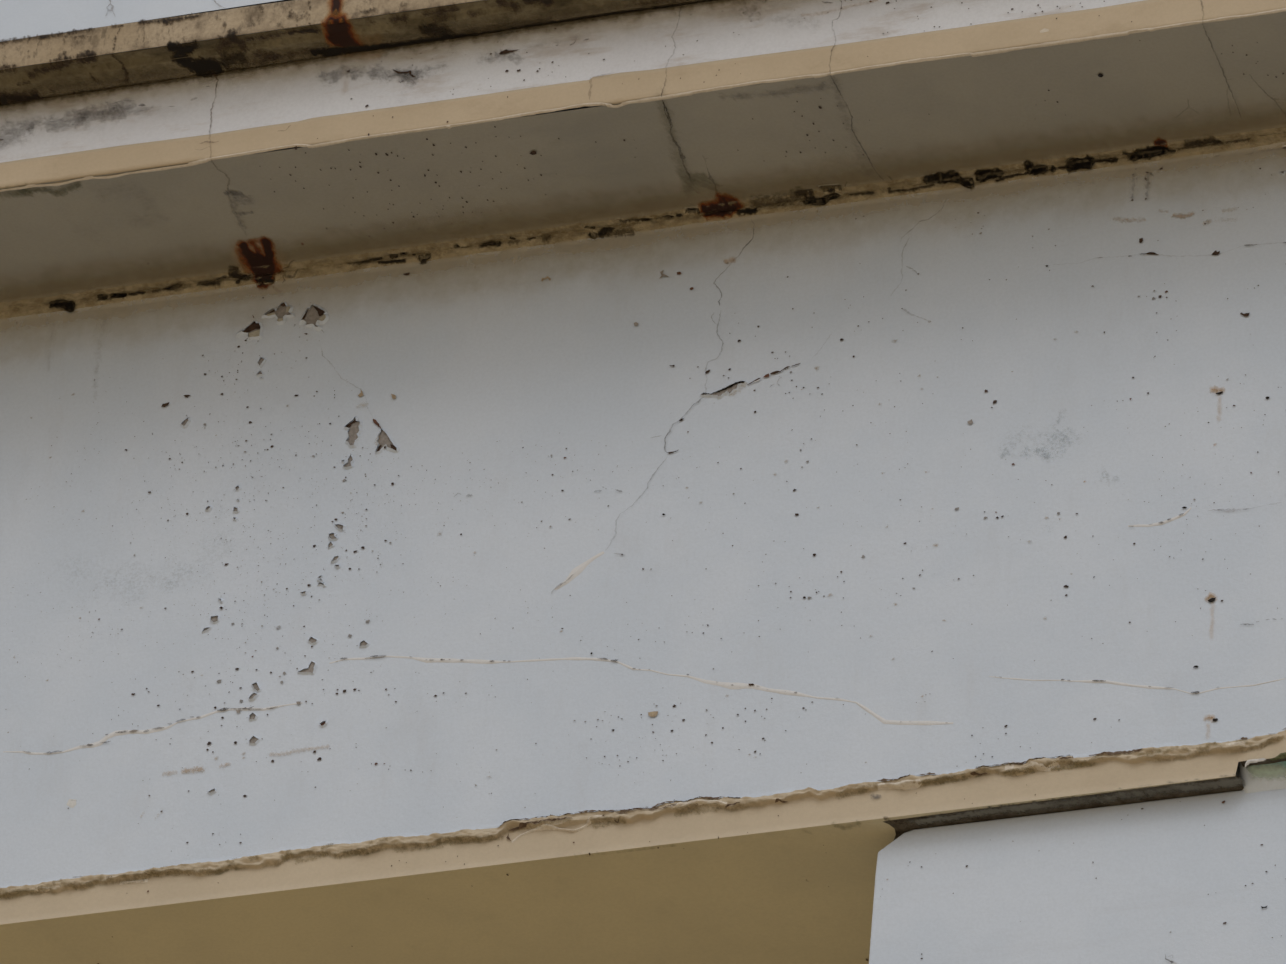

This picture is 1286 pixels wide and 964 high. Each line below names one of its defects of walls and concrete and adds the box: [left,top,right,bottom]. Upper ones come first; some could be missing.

water stain [0,14,200,105]
rust [322,0,362,53]
water stain [167,0,714,79]
rust [699,192,744,219]
rust [233,236,300,289]
peeling [123,297,495,775]
crack [329,655,954,725]
crack [3,701,302,755]
peeling [858,725,1266,840]
spalling [477,796,740,856]